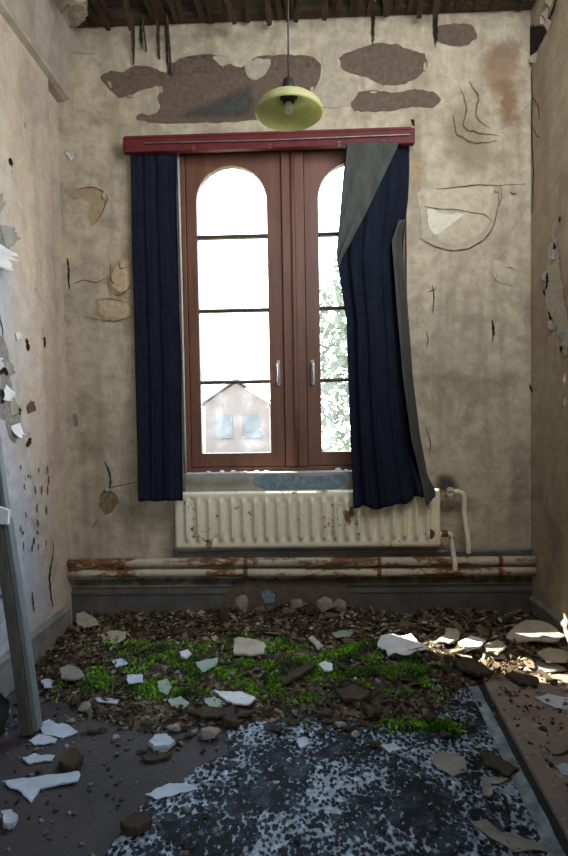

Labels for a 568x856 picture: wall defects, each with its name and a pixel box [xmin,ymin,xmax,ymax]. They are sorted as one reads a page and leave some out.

peeling [437,23,477,46]
peeling [100,54,321,124]
peeling [339,43,441,112]
peeling [0,225,22,271]
peeling [0,336,36,447]